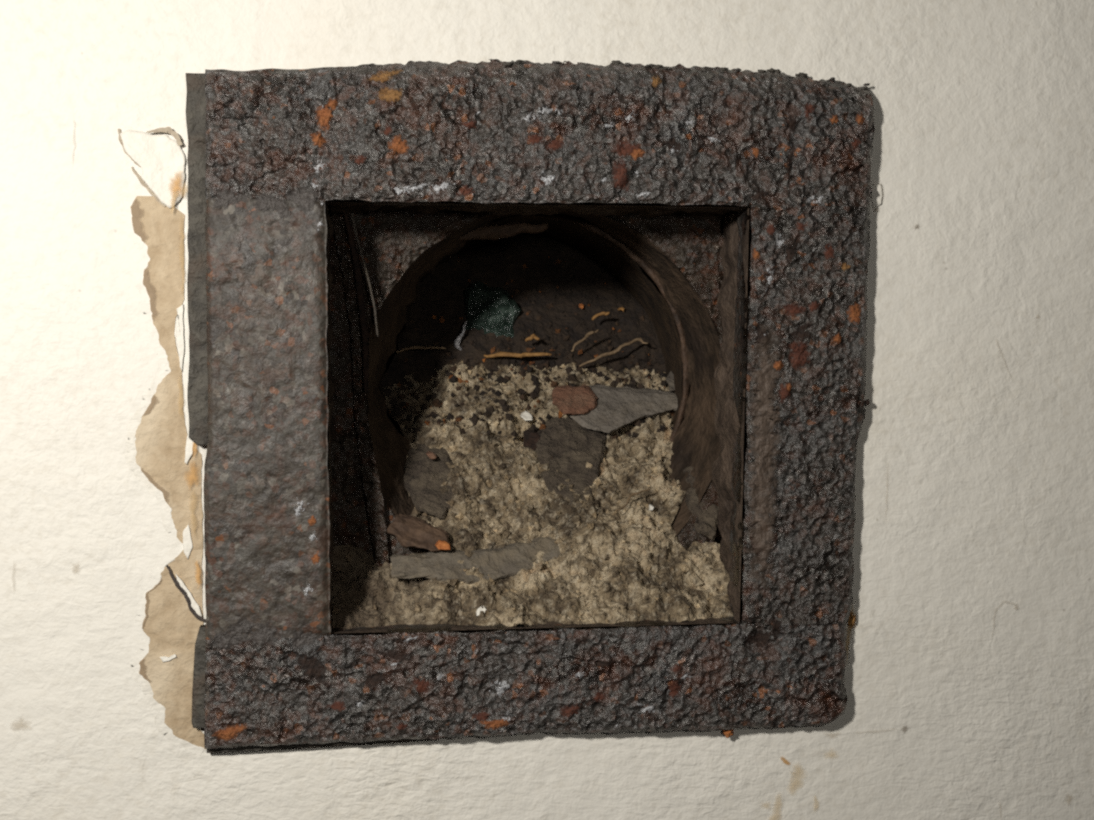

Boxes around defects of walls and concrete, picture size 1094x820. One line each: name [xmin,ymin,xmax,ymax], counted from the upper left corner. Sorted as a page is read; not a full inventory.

peeling [120,130,205,756]